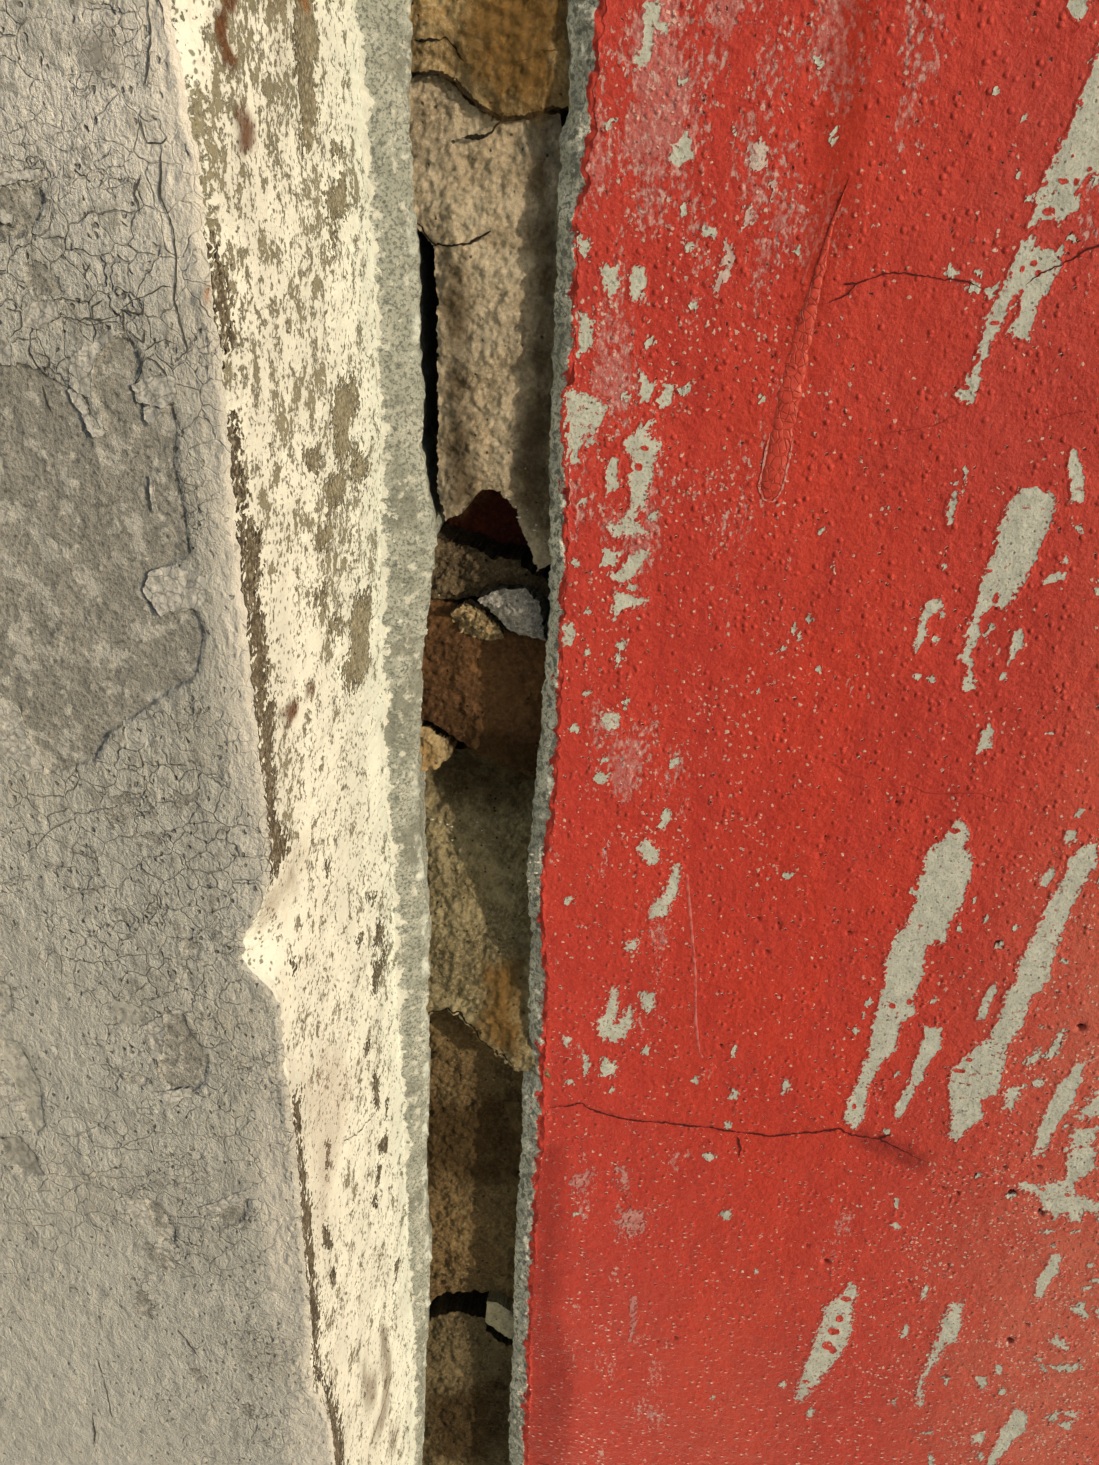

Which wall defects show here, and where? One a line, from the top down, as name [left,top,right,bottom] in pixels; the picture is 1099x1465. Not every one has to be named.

crack [411,36,562,140]
crack [829,271,986,303]
peeling [944,36,1099,409]
crack [1026,245,1099,285]
peeling [0,329,208,776]
peeling [558,336,692,669]
peeling [954,445,1088,694]
peeling [621,808,686,954]
peeling [559,983,658,1094]
peeling [841,808,1099,1299]
crack [552,1103,928,1163]
peeling [778,1279,863,1417]